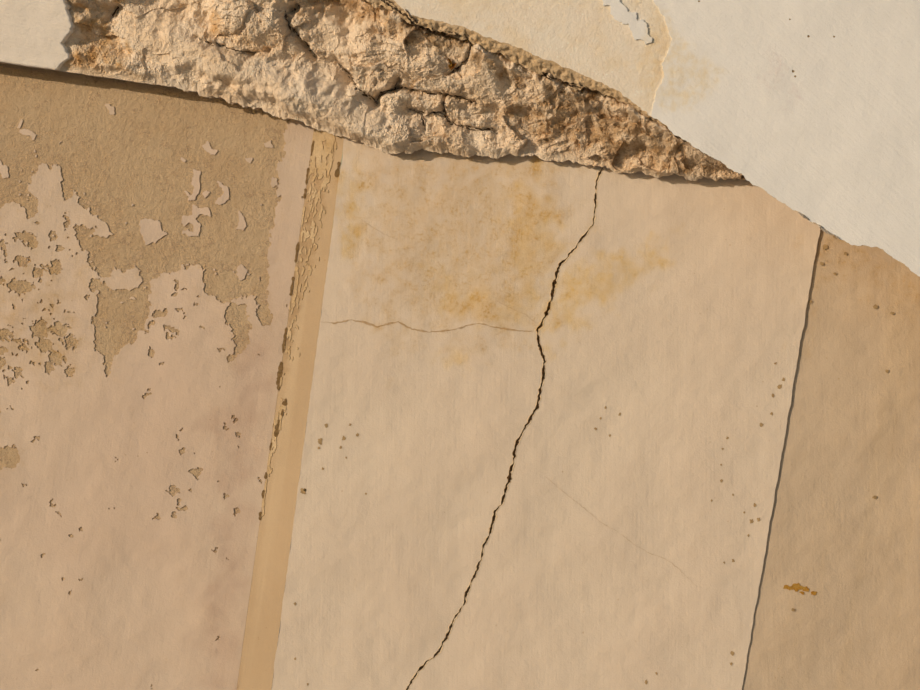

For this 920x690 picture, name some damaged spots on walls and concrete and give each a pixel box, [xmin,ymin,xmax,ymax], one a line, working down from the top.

flaking render [0,0,745,520]
crack [328,167,605,690]
rust [783,583,817,595]